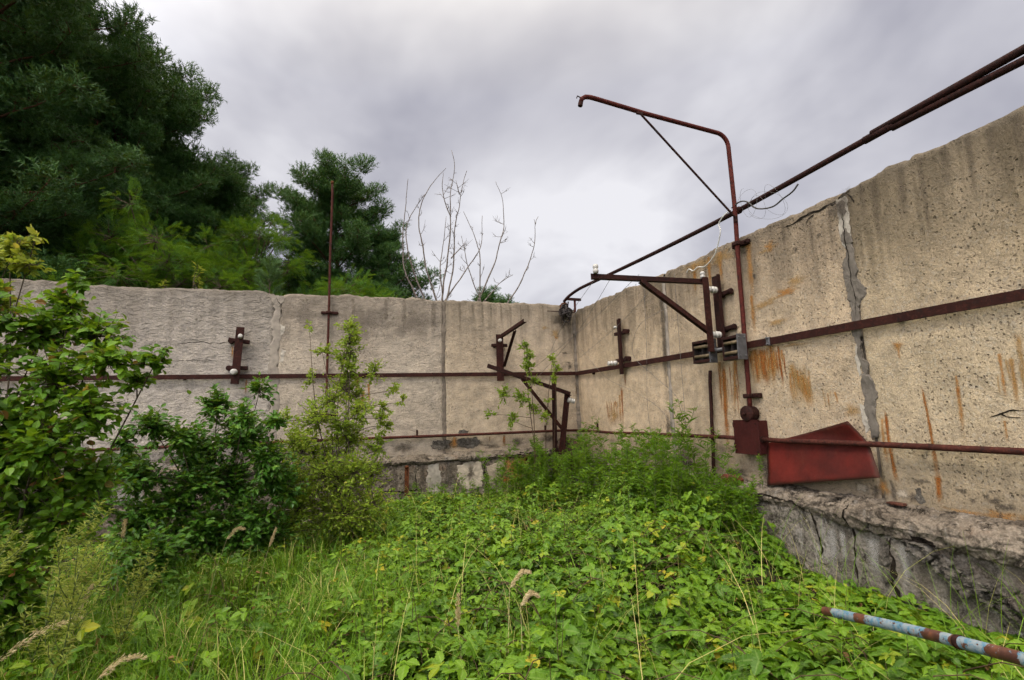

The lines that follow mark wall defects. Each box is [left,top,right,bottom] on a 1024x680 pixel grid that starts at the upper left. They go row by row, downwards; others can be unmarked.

crack [786,190,854,227]
rust [718,360,739,441]
rust [749,344,838,404]
rust [997,339,1024,394]
rust [881,413,896,474]
rust [923,393,941,498]
crack [842,504,900,598]